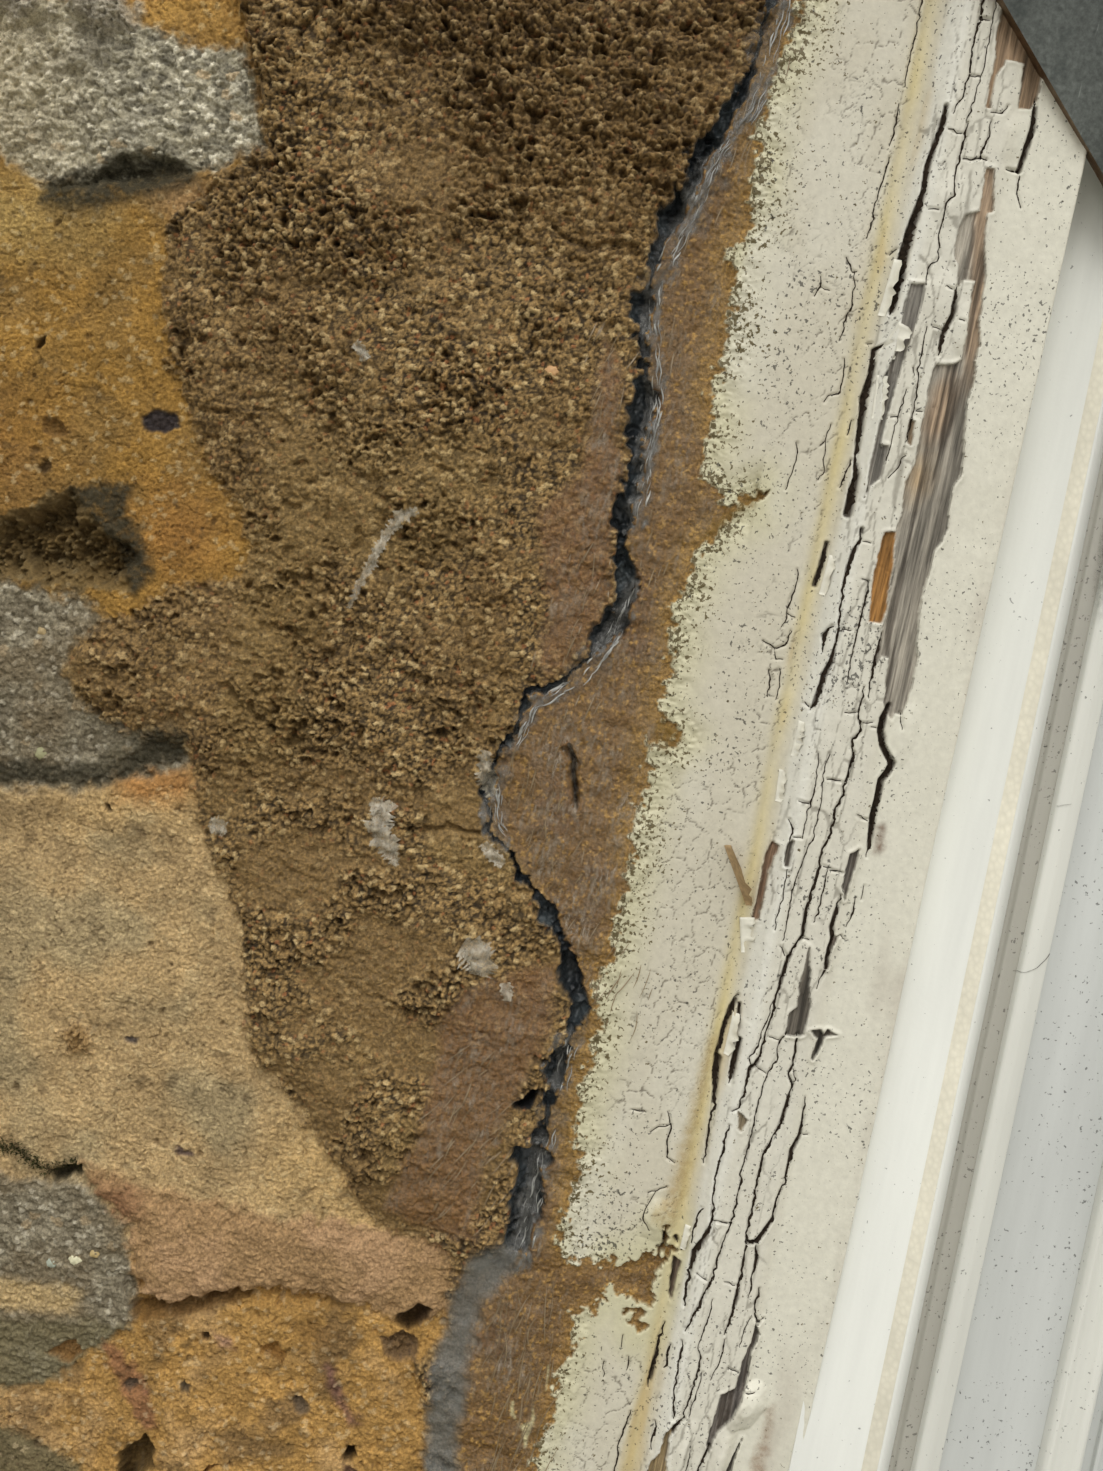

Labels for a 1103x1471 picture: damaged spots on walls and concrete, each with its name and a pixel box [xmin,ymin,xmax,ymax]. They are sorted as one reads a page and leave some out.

peeling [987,14,1042,109]
peeling [864,167,996,718]
crack [479,0,778,1252]
crack [602,0,1036,1471]
peeling [724,840,795,952]
peeling [842,850,860,899]
peeling [724,1012,740,1056]
peeling [785,936,838,1060]
peeling [669,1224,691,1298]
peeling [707,1322,761,1447]
peeling [647,1426,673,1471]
peeling [726,1439,743,1471]